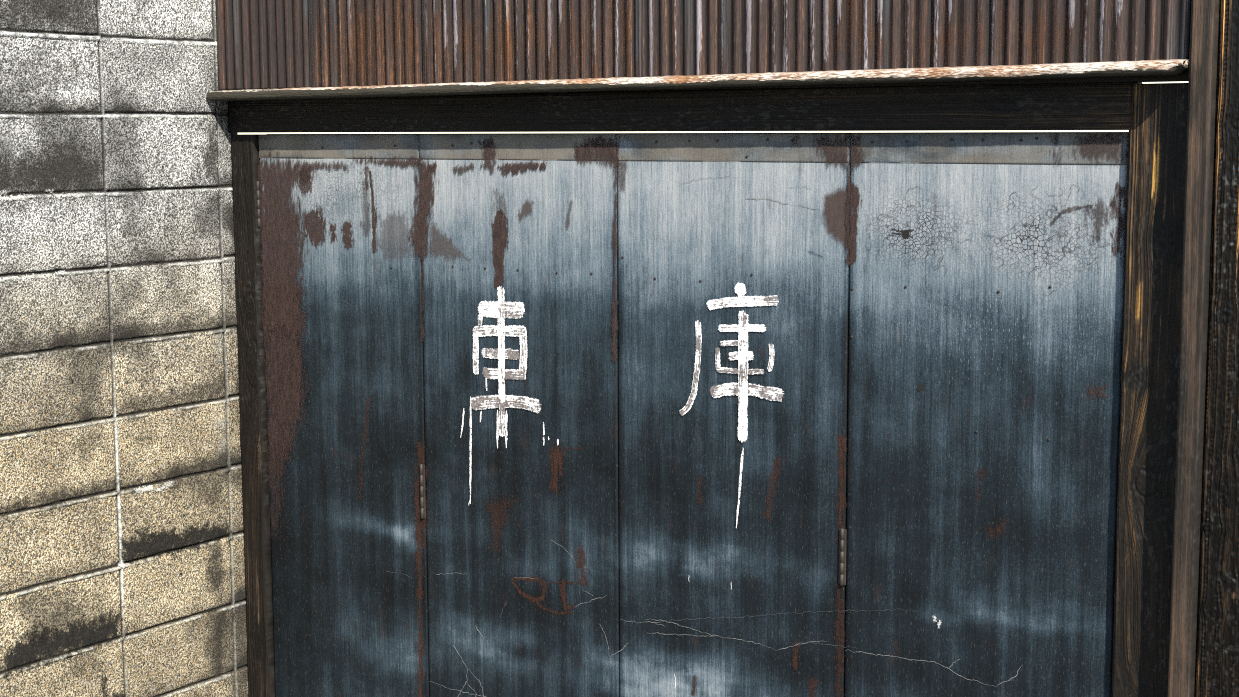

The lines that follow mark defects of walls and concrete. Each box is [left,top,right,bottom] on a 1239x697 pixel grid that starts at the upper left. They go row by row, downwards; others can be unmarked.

damp [0,0,102,38]
damp [0,142,102,196]
damp [204,133,218,181]
corrosion [1050,133,1127,162]
corrosion [816,134,864,266]
corrosion [258,139,547,475]
damp [132,453,230,488]
damp [0,481,115,518]
damp [121,520,232,590]
damp [0,608,126,680]
damp [209,609,227,672]